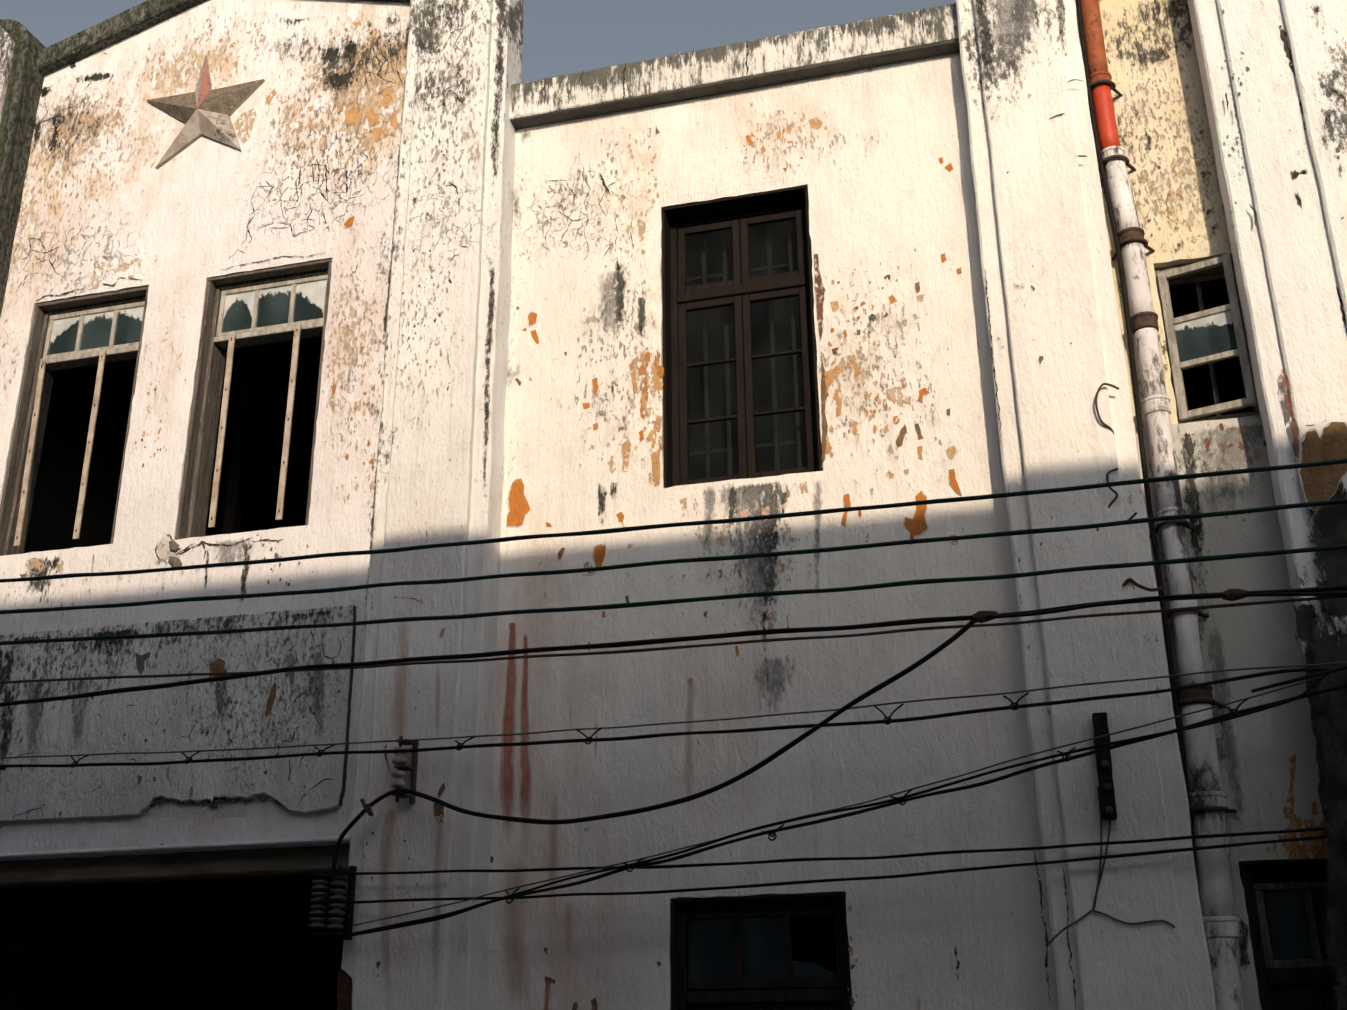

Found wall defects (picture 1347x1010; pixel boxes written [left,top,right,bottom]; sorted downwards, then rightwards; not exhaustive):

leakage [491,0,506,177]
crack [13,228,139,301]
crack [222,153,368,270]
crack [543,171,634,261]
leakage [483,269,495,486]
peeling [506,478,532,529]
peeling [609,351,664,487]
leakage [704,482,794,700]
peeling [814,253,962,497]
peeling [1280,368,1347,511]
rust [502,623,530,816]
leakage [1294,480,1347,1010]